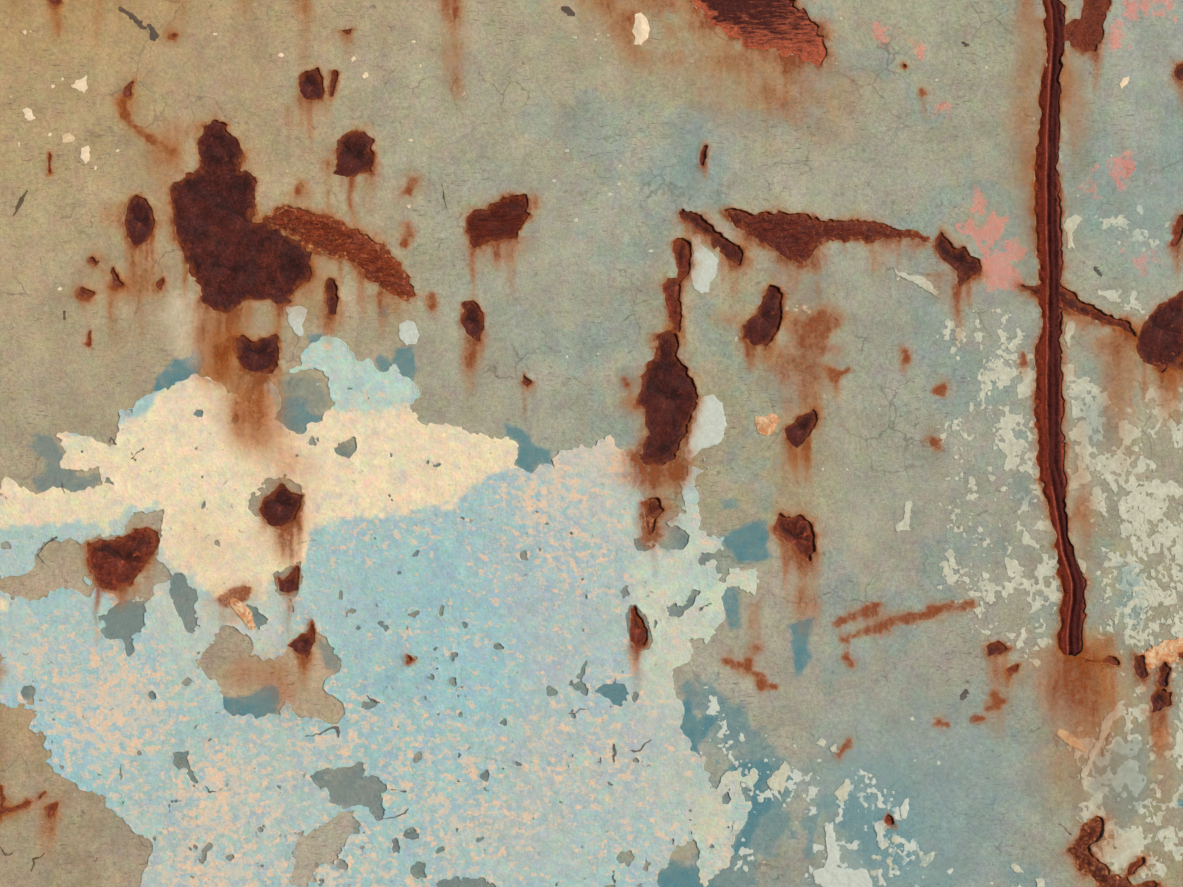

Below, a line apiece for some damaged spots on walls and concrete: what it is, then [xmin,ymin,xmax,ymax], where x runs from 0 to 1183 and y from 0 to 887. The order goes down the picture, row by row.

rust [120,119,339,431]
spalling [262,204,417,314]
rust [465,193,537,270]
peeling [691,235,719,294]
spalling [720,208,930,269]
rust [622,209,747,543]
rust [1102,290,1183,396]
peeling [936,308,1062,667]
rust [86,527,160,607]
peeling [0,306,938,887]
peeling [1057,364,1183,880]
rust [1066,816,1163,887]